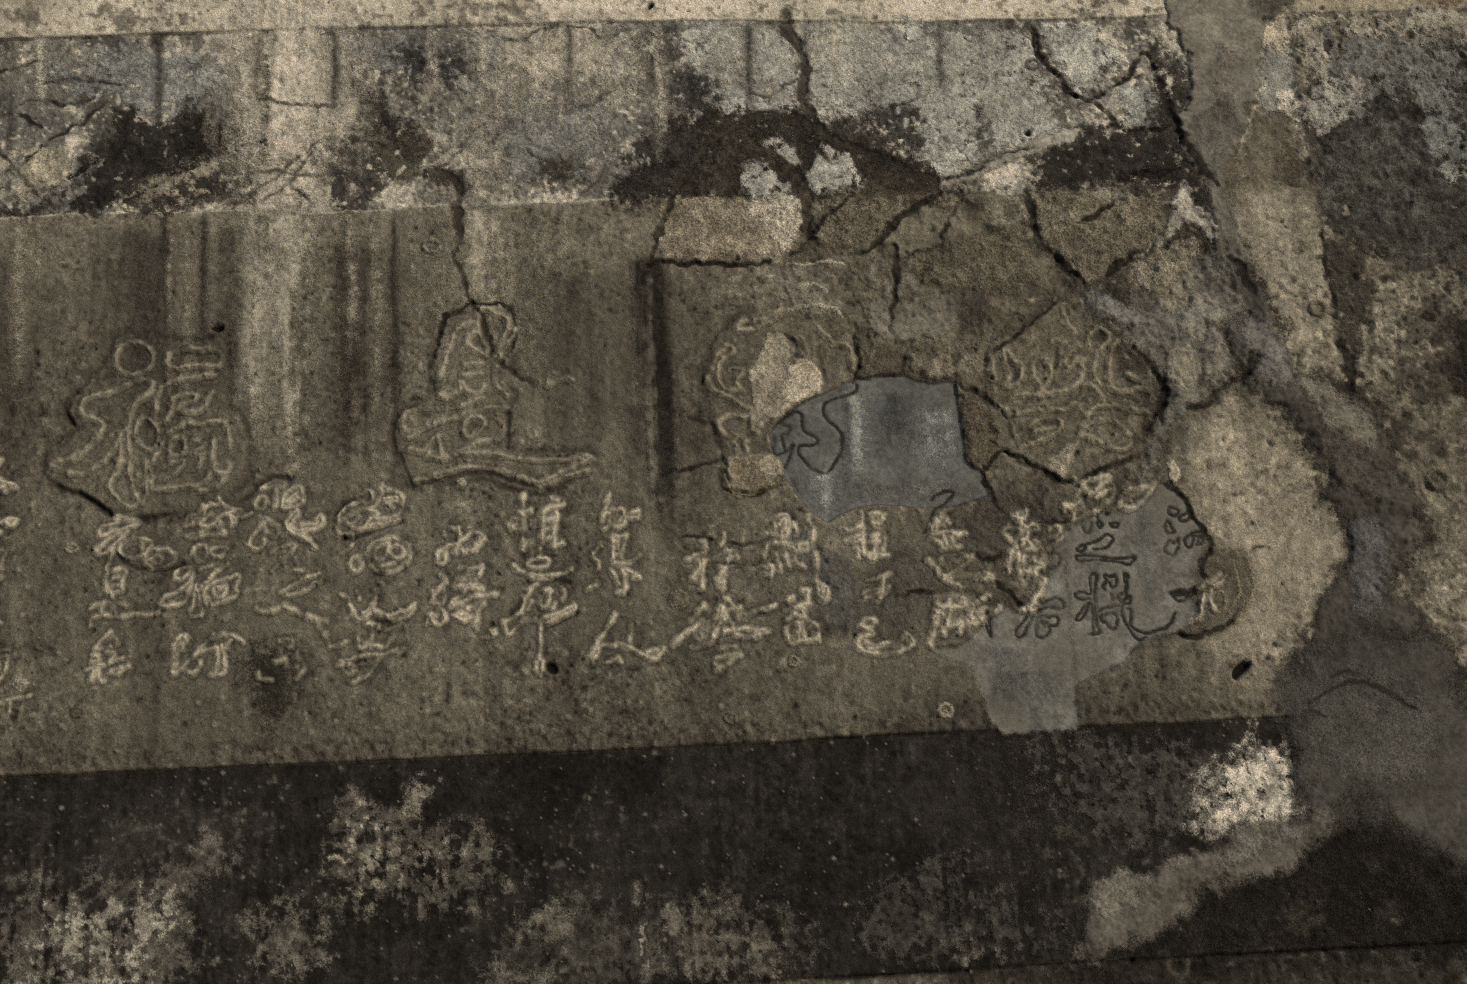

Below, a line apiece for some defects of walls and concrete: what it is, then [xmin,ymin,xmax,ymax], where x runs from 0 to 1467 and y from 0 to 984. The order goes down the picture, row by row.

crack [415,126,537,388]
water stain [0,0,982,474]
water stain [630,259,677,523]
crack [647,8,1029,383]
crack [993,190,1139,351]
crack [958,344,1259,507]
water stain [1009,36,1215,467]
crack [1031,30,1220,224]
crack [1164,482,1213,596]
water stain [1219,327,1354,776]
water stain [1294,41,1467,709]
water stain [1047,791,1467,984]